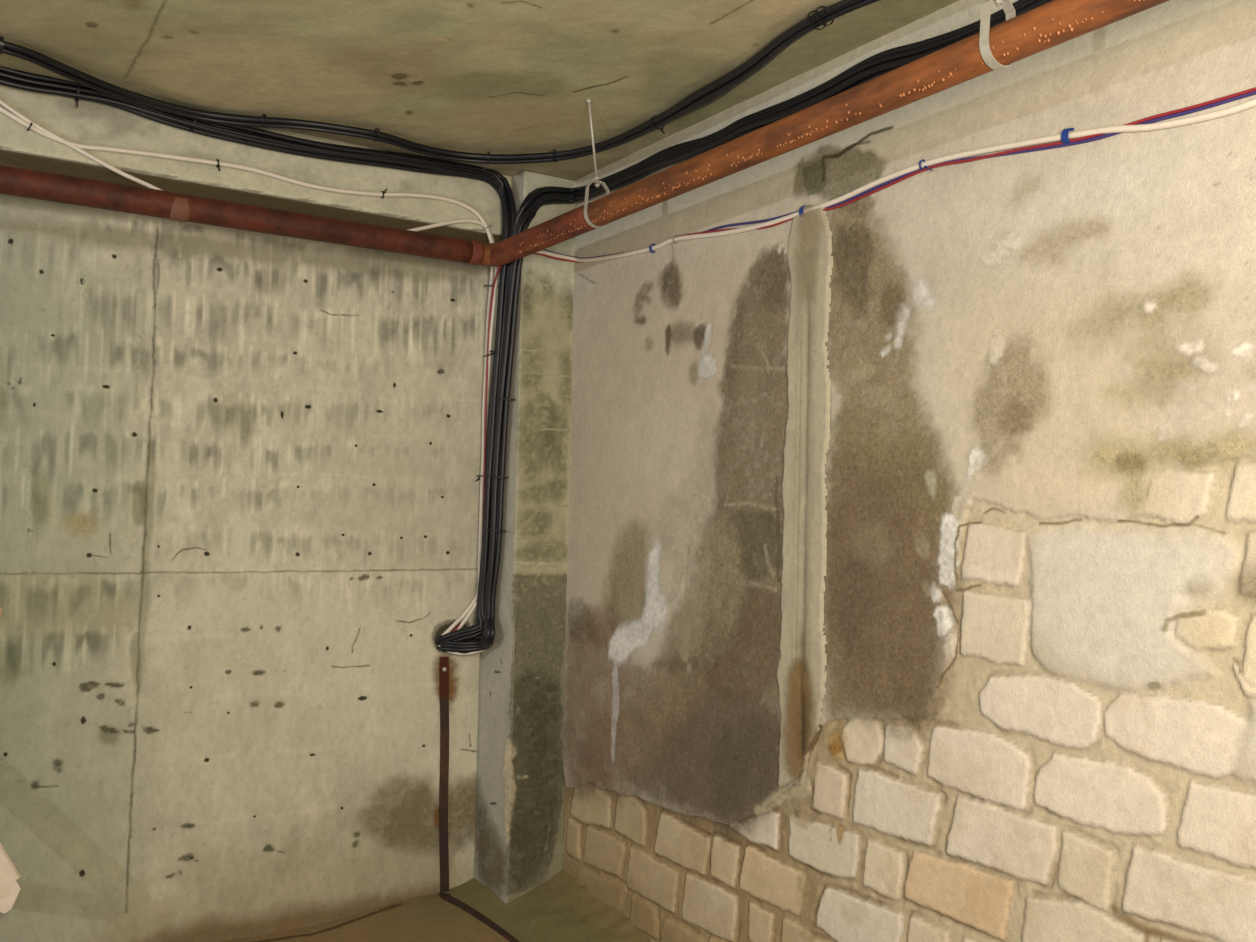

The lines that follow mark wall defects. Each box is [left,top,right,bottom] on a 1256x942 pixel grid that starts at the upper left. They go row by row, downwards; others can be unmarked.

damp [1140,282,1203,324]
damp [1146,340,1219,380]
damp [1231,341,1254,356]
damp [795,147,1045,716]
damp [380,243,789,894]
corrosion [786,662,812,777]
flaking render [755,751,816,814]